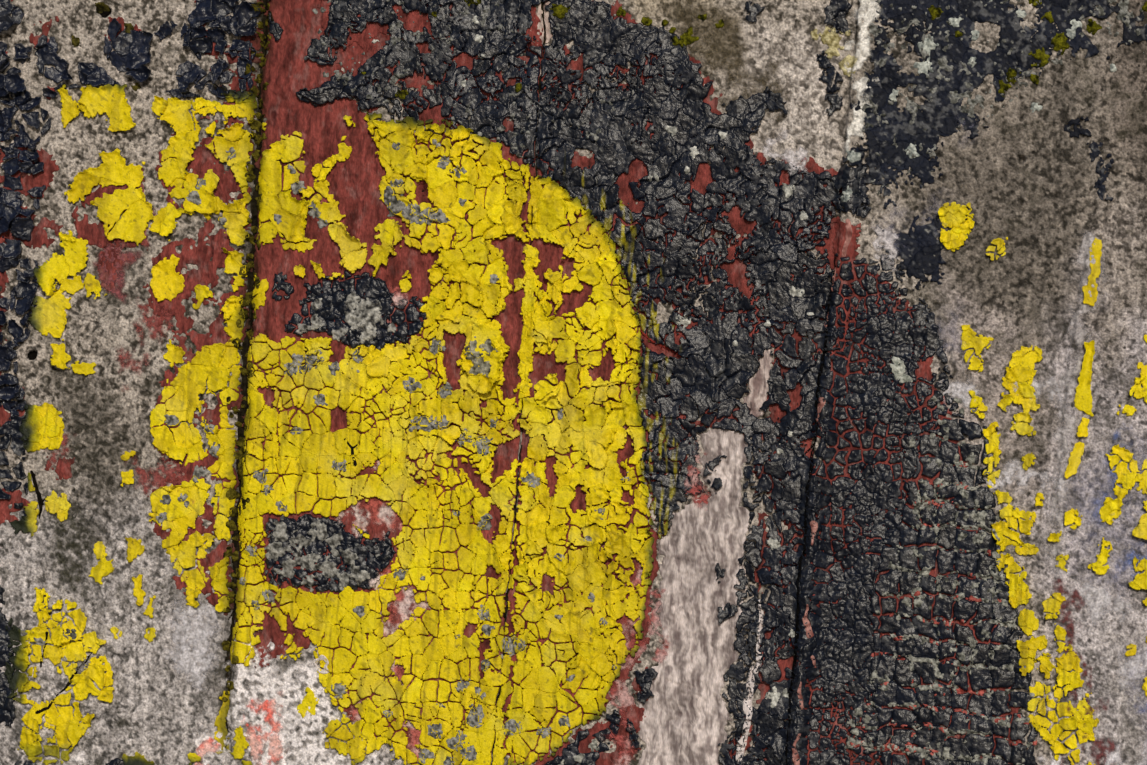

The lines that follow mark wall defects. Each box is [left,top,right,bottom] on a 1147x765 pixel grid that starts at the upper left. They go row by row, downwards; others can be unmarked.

crack [534,1,546,179]
spalling [0,0,264,618]
crack [224,0,274,751]
crack [344,438,358,467]
crack [492,398,523,762]
crack [640,330,681,357]
crack [785,257,837,765]
peeling [893,215,946,291]
peeling [997,345,1043,436]
peeling [1088,444,1147,575]
peeling [0,586,122,765]
peeling [1016,635,1099,765]